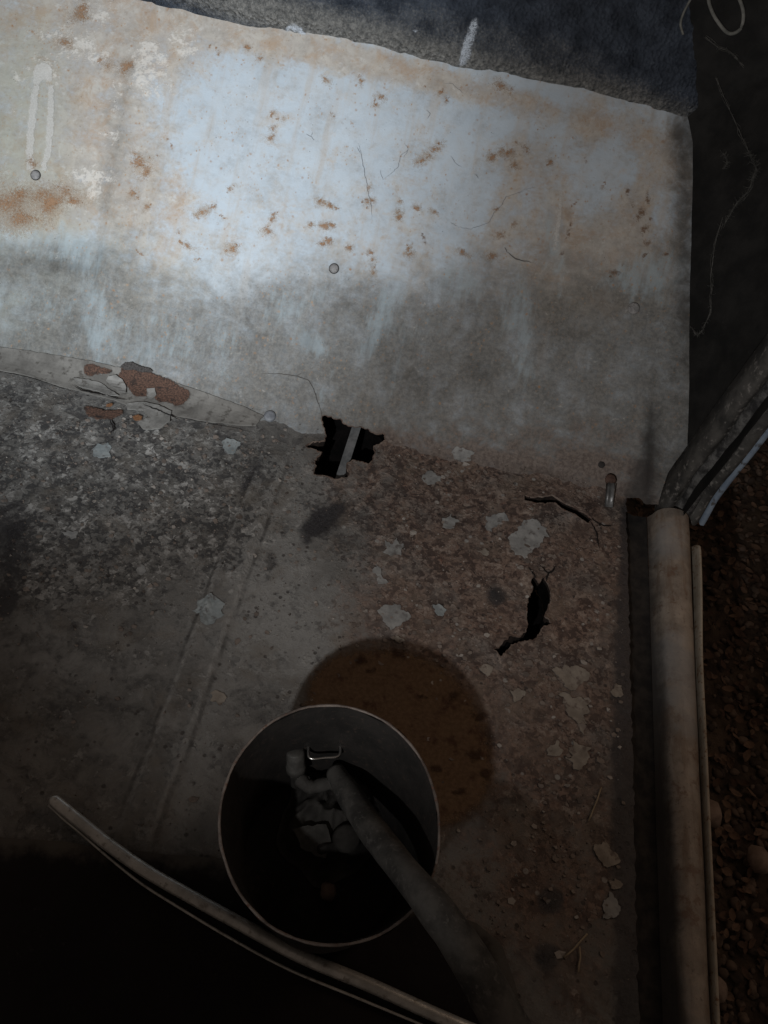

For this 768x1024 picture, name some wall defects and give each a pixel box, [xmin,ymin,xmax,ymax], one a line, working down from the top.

rust [0,186,81,226]
peeling [73,362,189,433]
spalling [306,416,385,479]
crack [523,494,611,548]